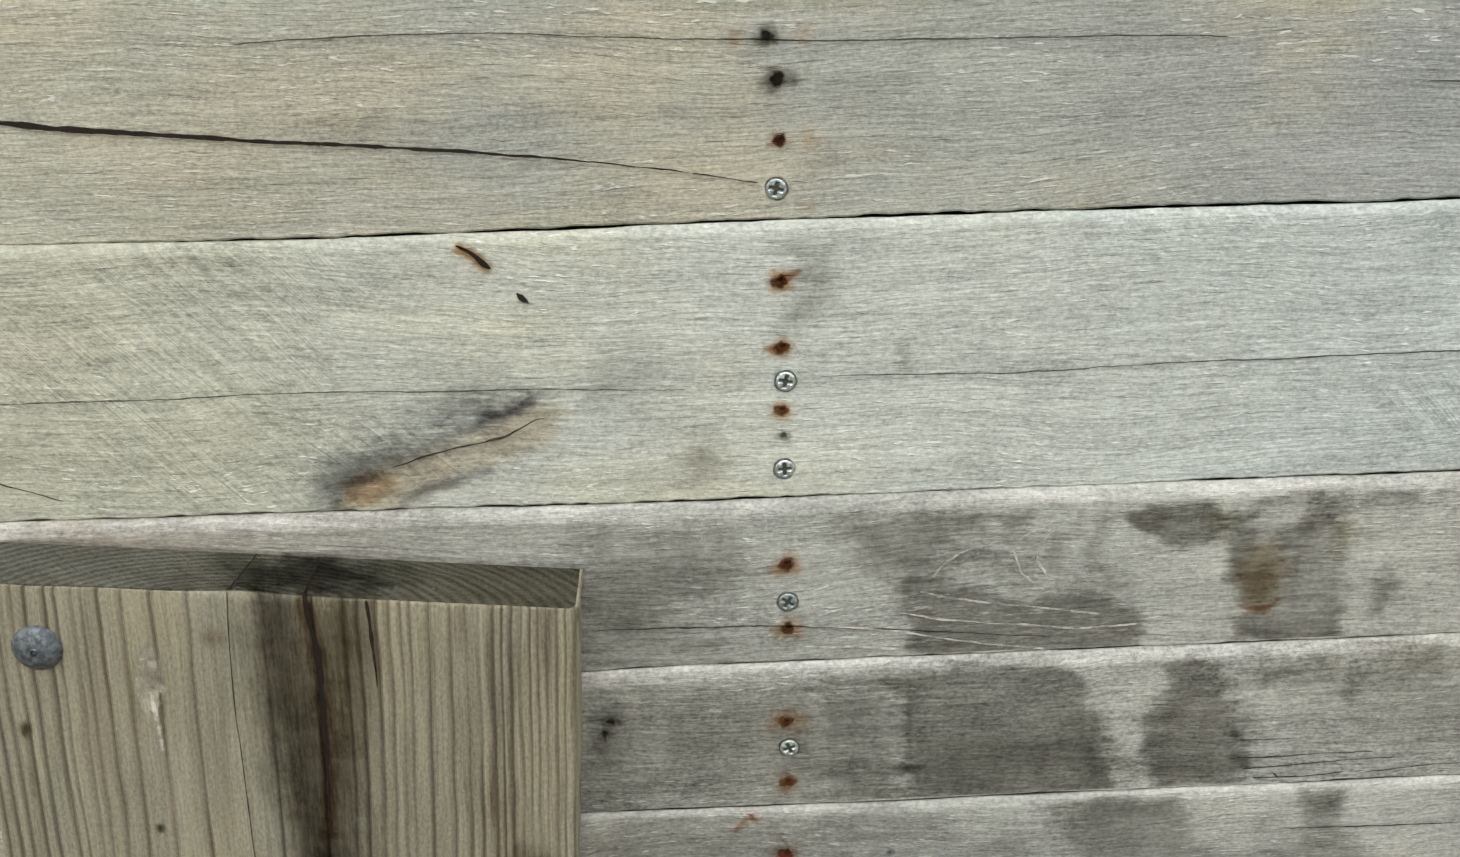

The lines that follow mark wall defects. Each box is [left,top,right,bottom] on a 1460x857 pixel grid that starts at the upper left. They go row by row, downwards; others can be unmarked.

corrosion [773,133,786,147]
crack [0,121,758,183]
corrosion [770,274,787,288]
corrosion [775,341,790,354]
crack [0,388,685,405]
corrosion [774,405,789,416]
crack [0,484,63,502]
corrosion [778,558,793,571]
water stain [239,554,390,591]
corrosion [781,622,794,634]
corrosion [779,717,794,728]